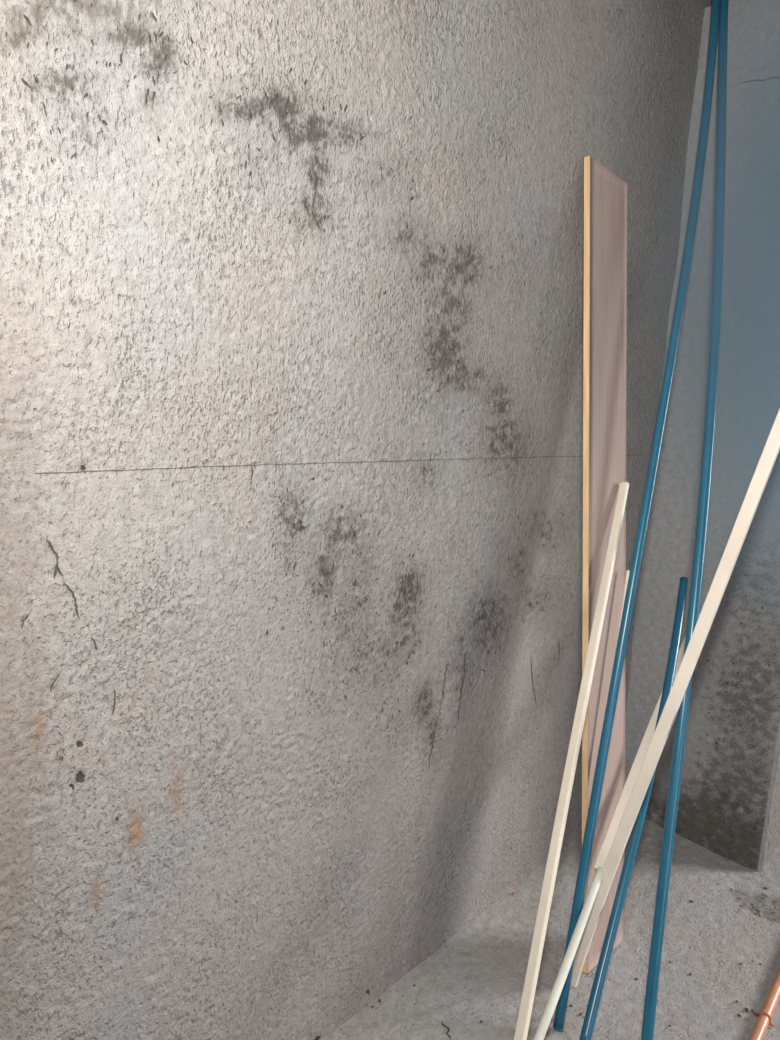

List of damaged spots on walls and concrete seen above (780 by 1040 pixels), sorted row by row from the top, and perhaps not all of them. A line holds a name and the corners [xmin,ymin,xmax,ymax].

damp [51,63,108,132]
damp [96,12,194,104]
damp [210,68,364,240]
damp [410,235,479,393]
damp [477,377,530,478]
crack [46,537,97,651]
damp [273,477,315,535]
damp [311,504,375,626]
damp [323,554,428,699]
damp [653,610,780,869]